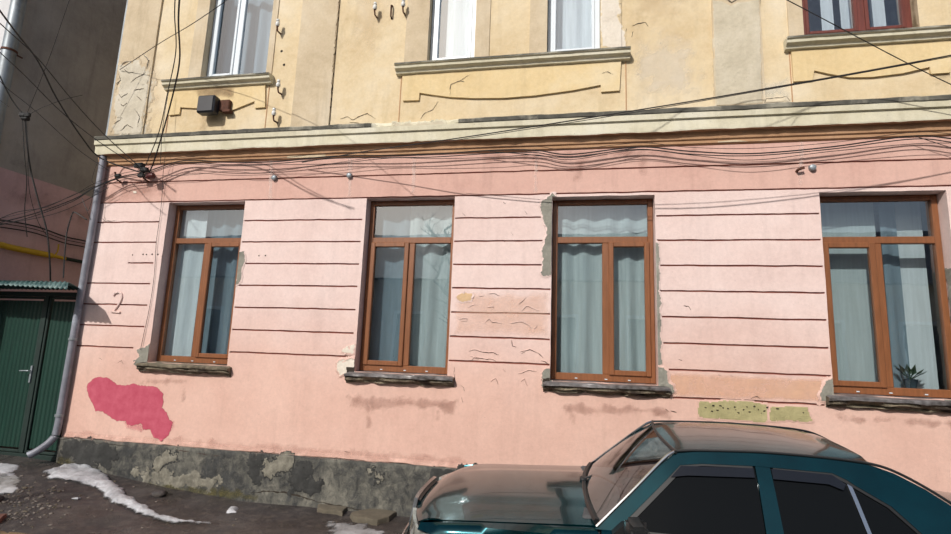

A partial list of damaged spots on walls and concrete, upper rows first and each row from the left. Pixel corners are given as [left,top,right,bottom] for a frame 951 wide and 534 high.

peeling [600,0,627,48]
peeling [109,54,157,135]
peeling [59,436,125,471]
peeling [130,445,223,495]
peeling [246,450,325,497]